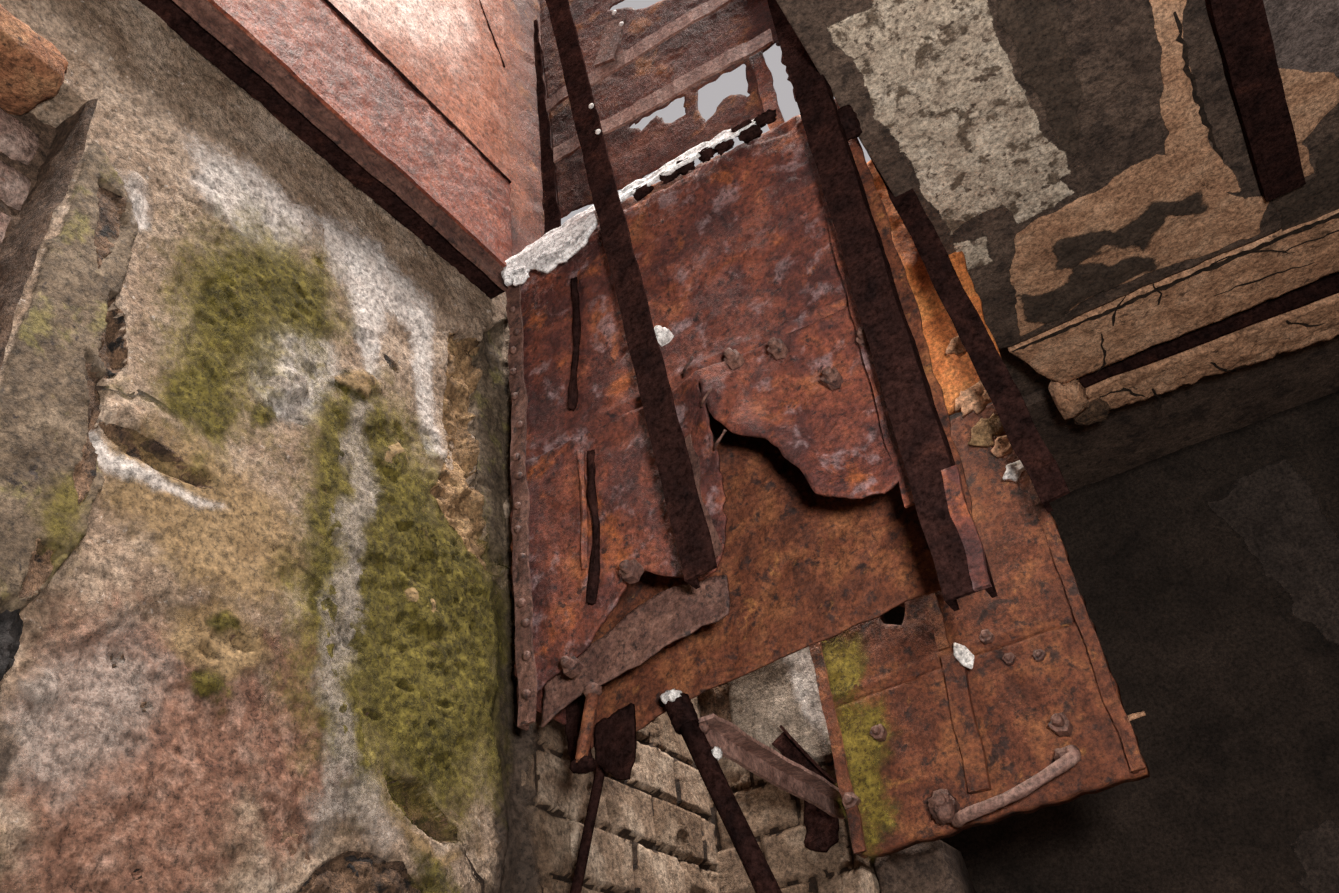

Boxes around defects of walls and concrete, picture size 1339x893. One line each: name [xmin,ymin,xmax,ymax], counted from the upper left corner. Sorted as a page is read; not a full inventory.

flaking render [0,142,138,696]
damp [131,181,147,227]
damp [195,146,445,455]
peeling [946,336,967,357]
peeling [827,0,1269,336]
flaking render [1279,68,1339,177]
spalling [382,317,541,893]
spalling [280,831,423,893]